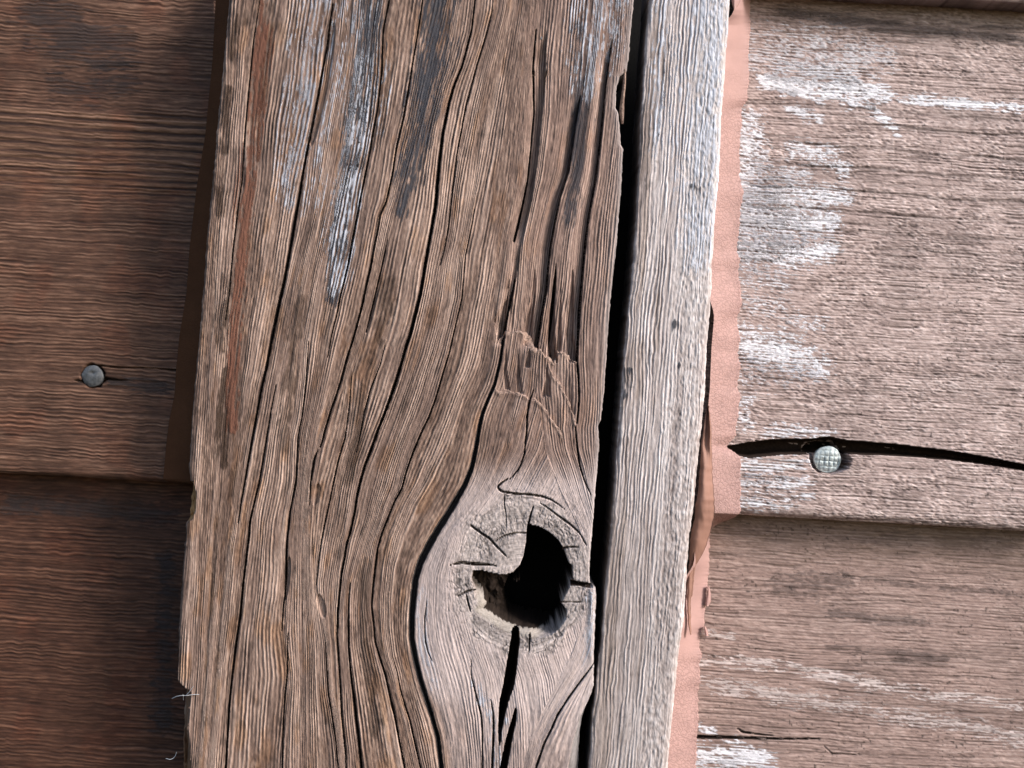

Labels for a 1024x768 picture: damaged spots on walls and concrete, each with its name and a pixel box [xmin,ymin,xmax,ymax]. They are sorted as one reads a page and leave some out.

crack [536,40,612,494]
crack [281,0,585,768]
crack [727,436,1024,471]
crack [560,579,591,603]
crack [535,663,594,768]